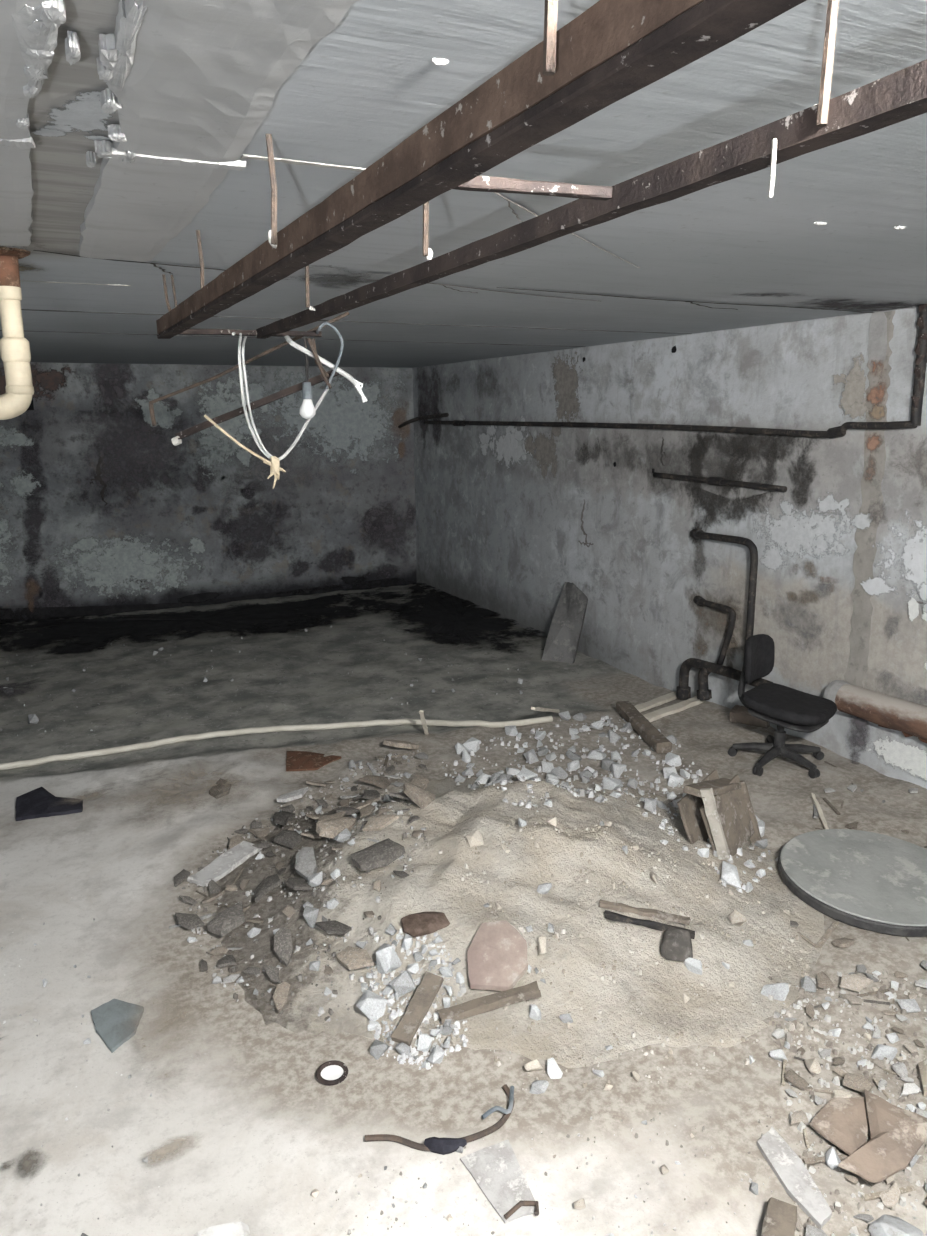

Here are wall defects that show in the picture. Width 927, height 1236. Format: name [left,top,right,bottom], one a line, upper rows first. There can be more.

flaking render [10,0,81,137]
flaking render [84,0,147,168]
crack [427,283,893,313]
flaking render [31,363,80,400]
leakage [71,363,215,515]
peeling [215,370,300,452]
leakage [417,368,459,448]
leakage [0,421,542,654]
leakage [578,440,746,526]
peeling [816,492,886,530]
peeling [860,577,894,596]
flaking render [907,582,927,622]